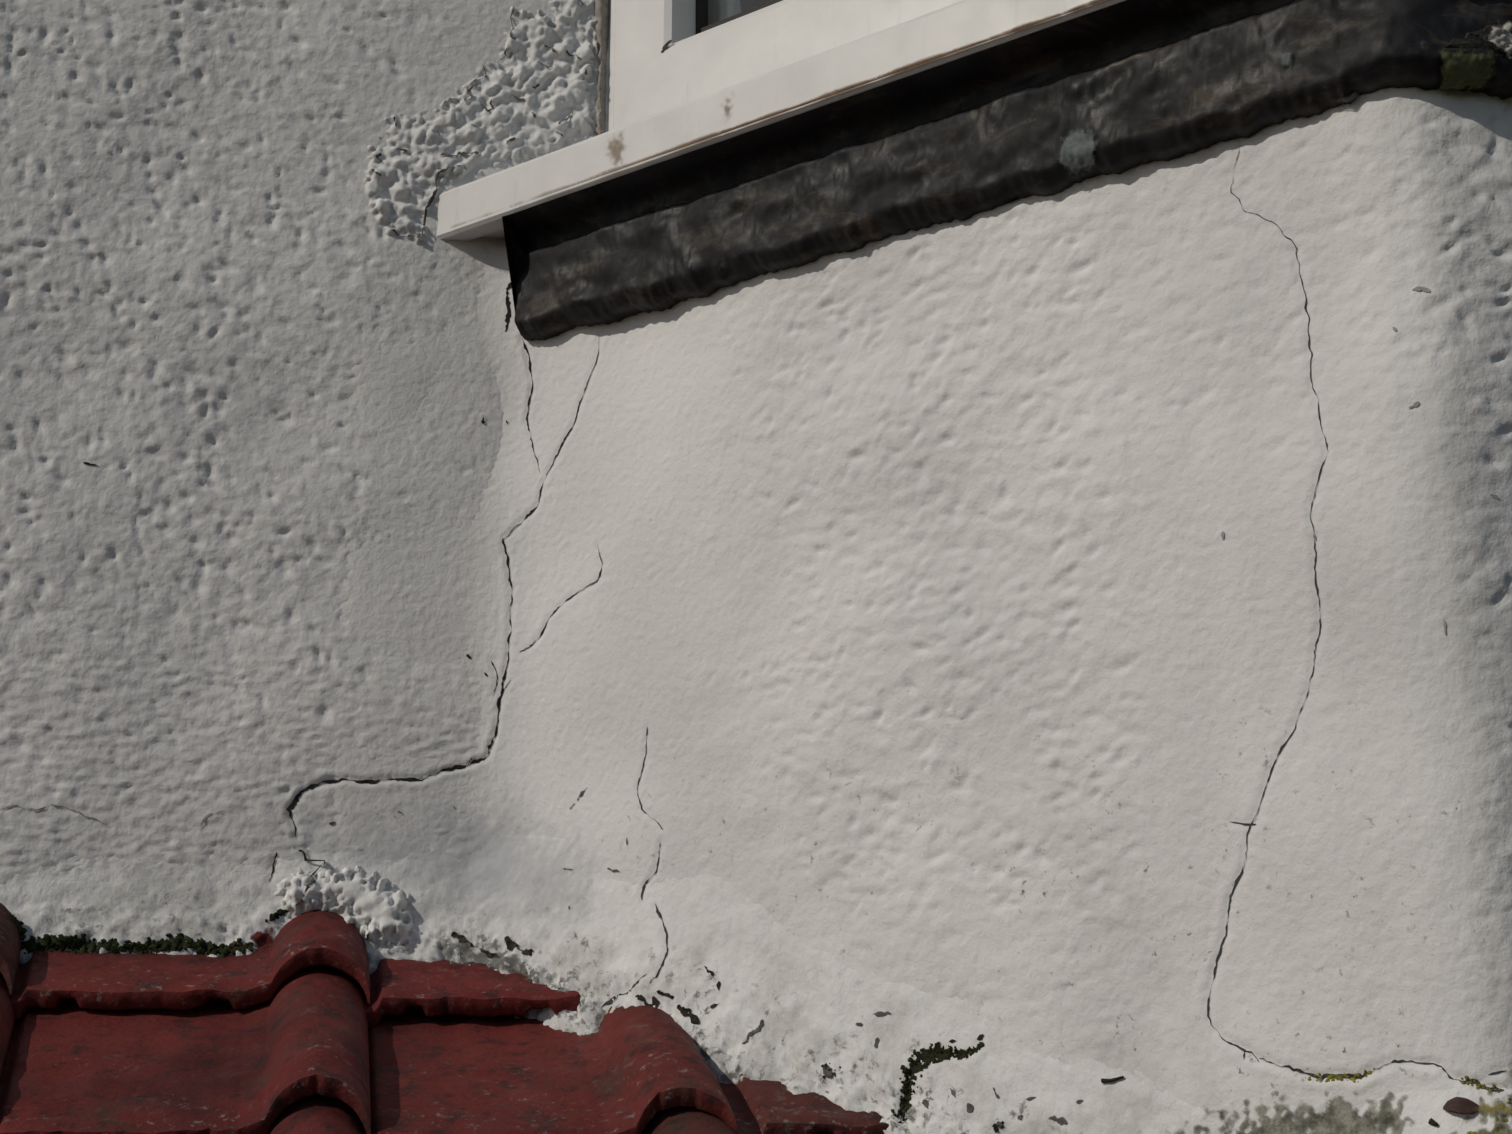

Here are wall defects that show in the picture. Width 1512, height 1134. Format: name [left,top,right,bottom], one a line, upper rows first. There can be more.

crack [461,9,514,105]
crack [391,164,465,237]
crack [269,282,602,906]
crack [1207,138,1507,1093]
crack [602,729,668,1007]